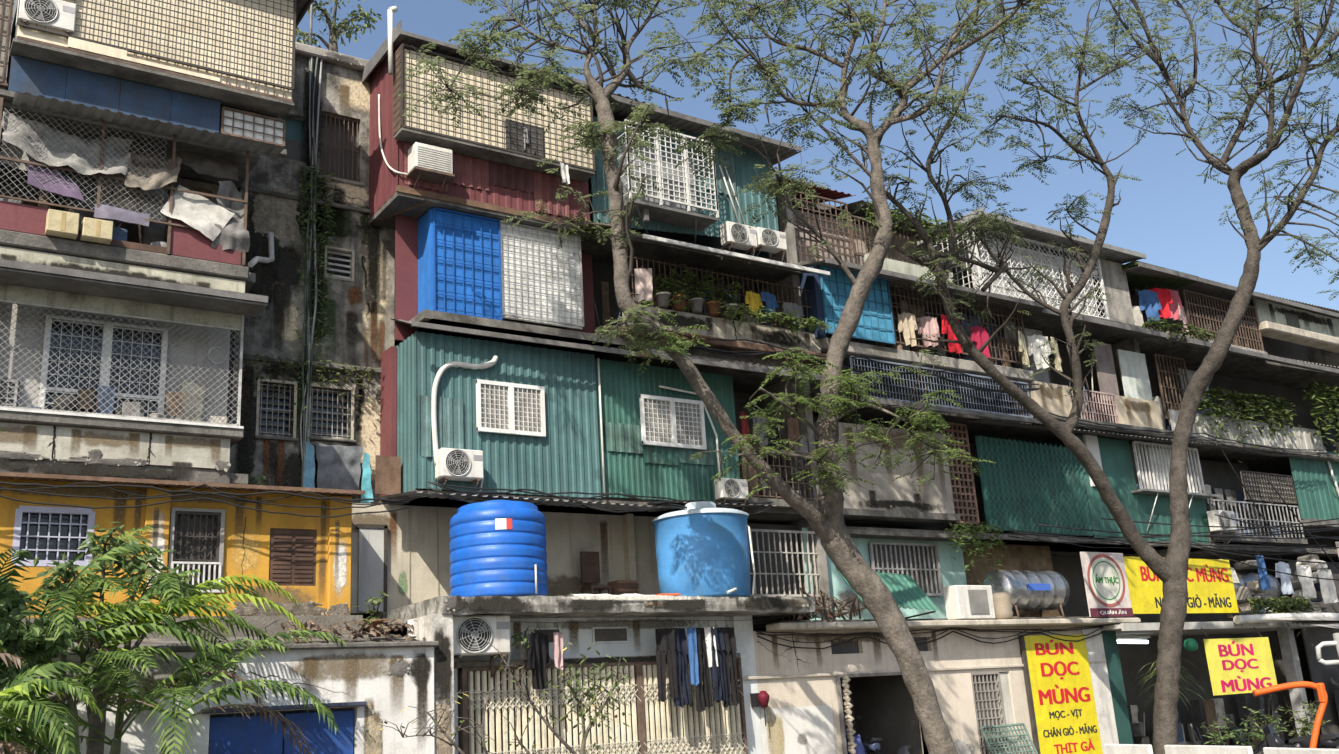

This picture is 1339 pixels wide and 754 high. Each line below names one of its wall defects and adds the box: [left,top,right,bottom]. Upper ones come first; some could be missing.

damp [303,72,323,166]
damp [245,178,379,351]
damp [291,632,452,719]